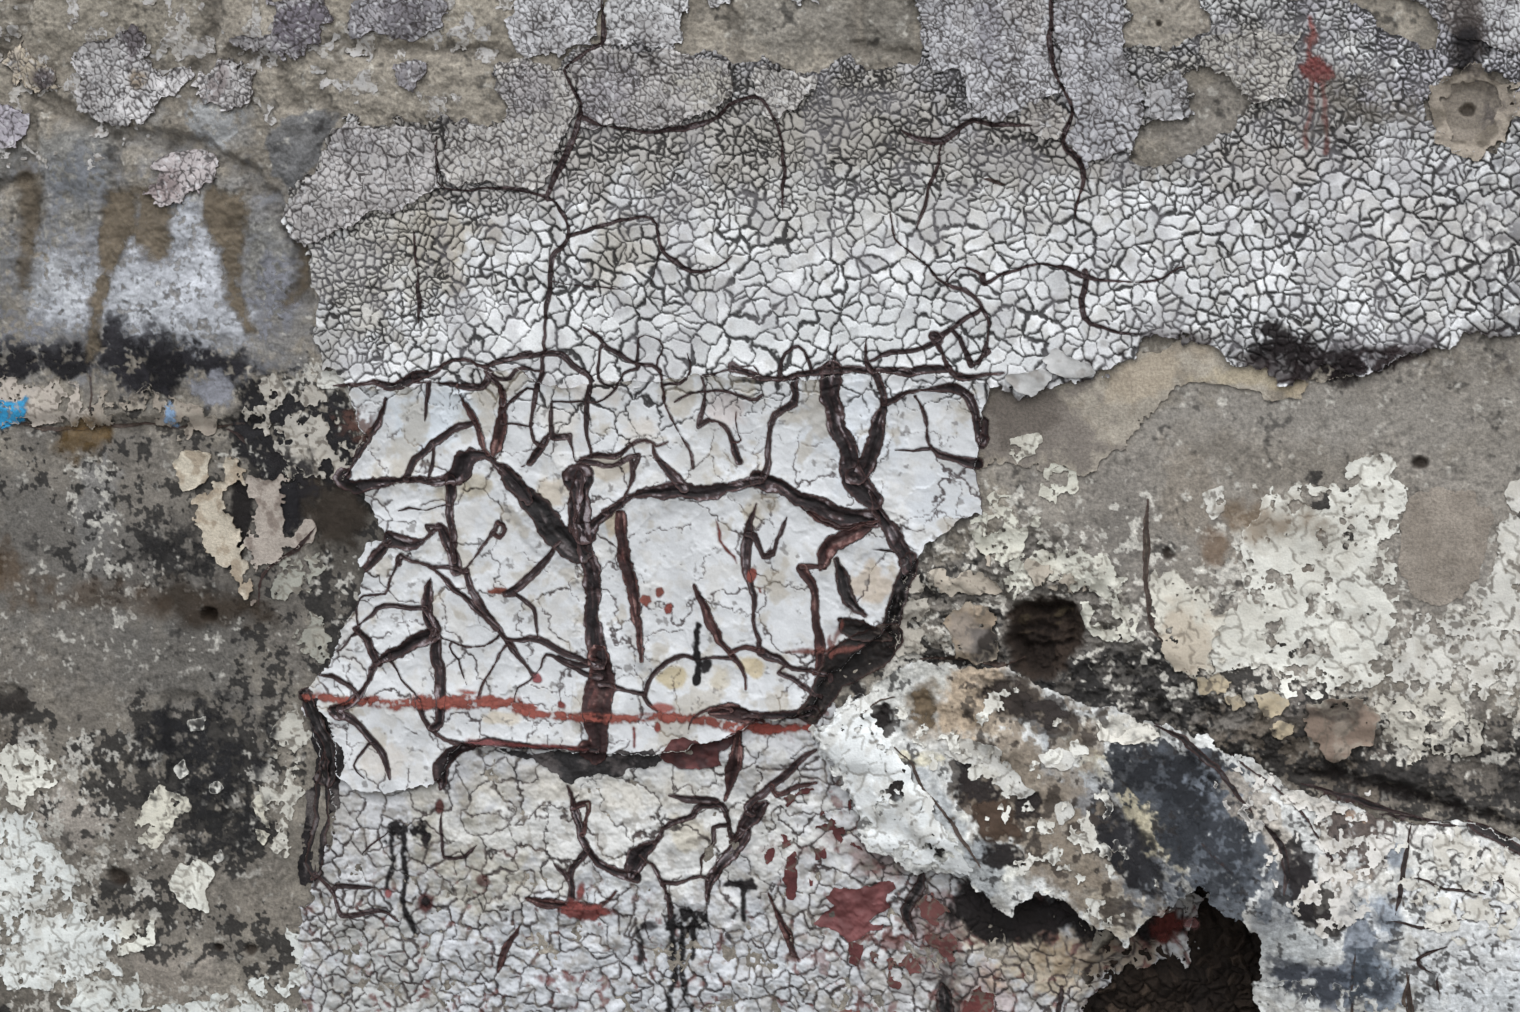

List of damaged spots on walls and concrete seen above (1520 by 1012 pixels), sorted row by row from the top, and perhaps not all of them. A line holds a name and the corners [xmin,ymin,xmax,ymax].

peeling [708,0,731,8]
peeling [0,0,690,171]
peeling [142,149,220,207]
crack [281,0,1520,973]
crack [258,526,317,605]
peeling [0,335,1520,1012]
crack [936,983,954,1012]
crack [1056,986,1064,1012]
crack [1349,955,1357,1012]